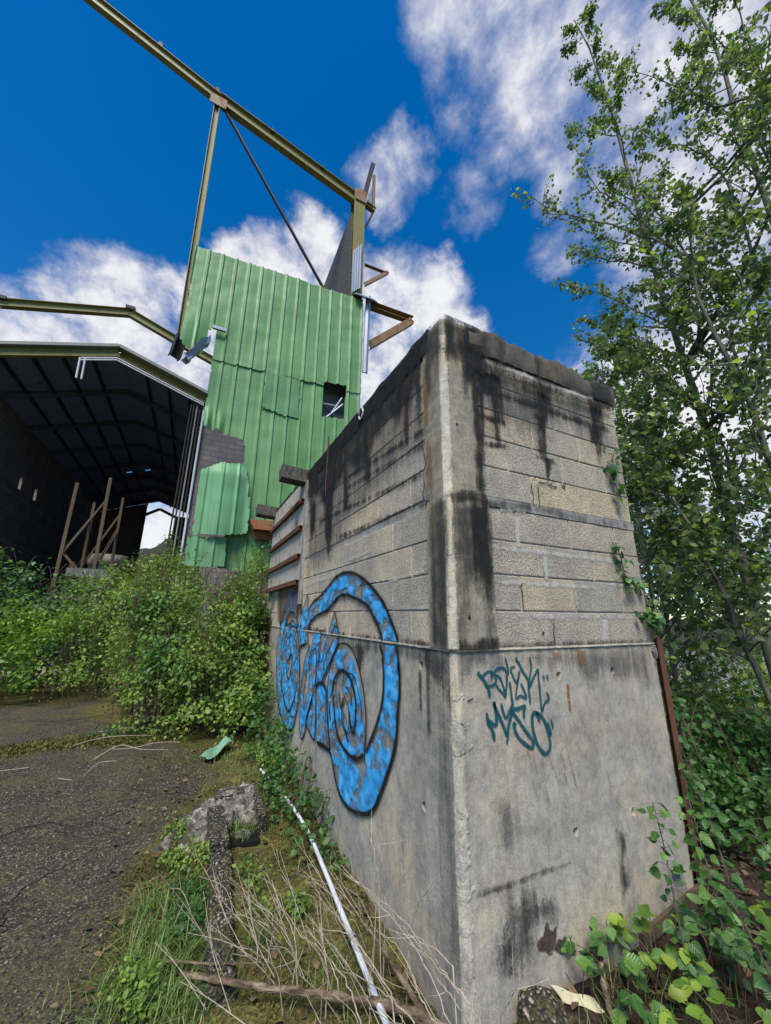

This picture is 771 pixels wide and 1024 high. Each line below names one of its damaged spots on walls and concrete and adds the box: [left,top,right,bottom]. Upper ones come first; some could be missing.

leakage [278,314,648,732]
leakage [500,890,554,971]